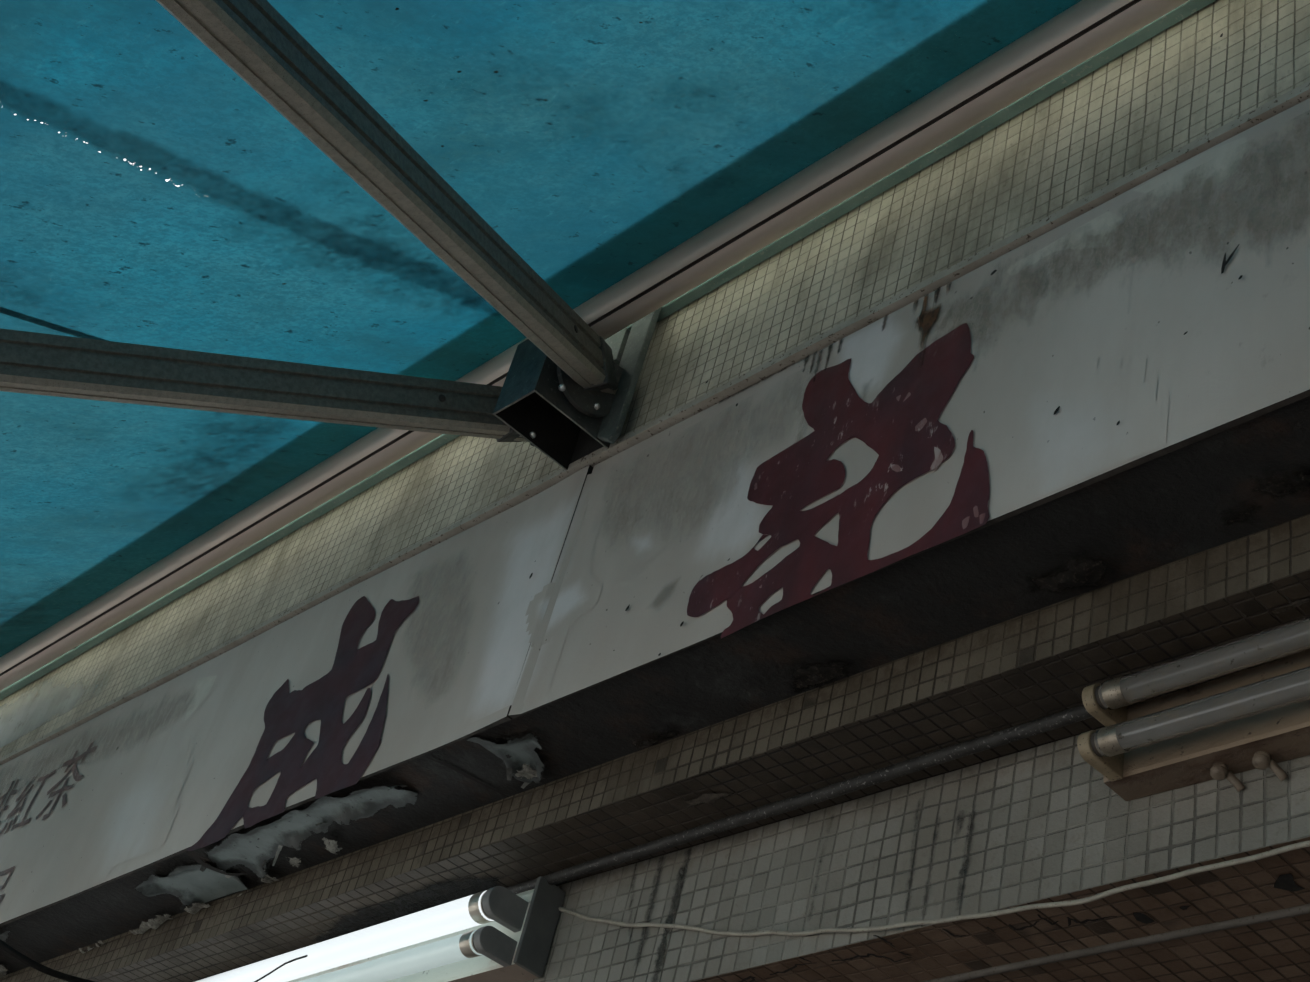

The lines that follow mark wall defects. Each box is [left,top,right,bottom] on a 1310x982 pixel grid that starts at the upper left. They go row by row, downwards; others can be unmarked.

peeling [466,733,545,789]
peeling [129,785,418,935]
water stain [637,857,663,962]
water stain [652,849,691,982]